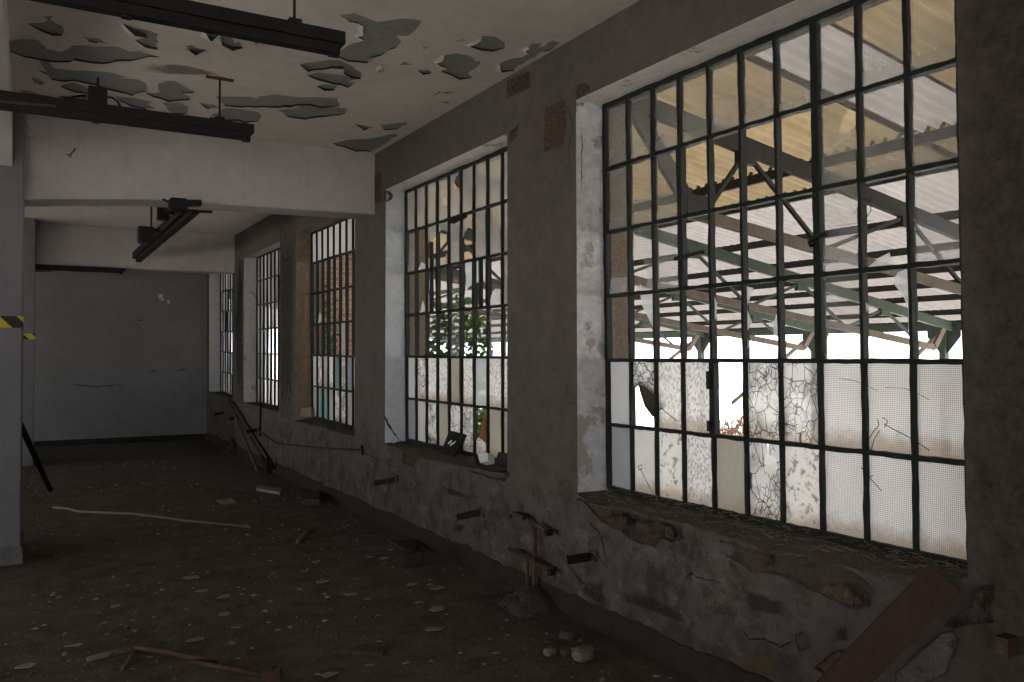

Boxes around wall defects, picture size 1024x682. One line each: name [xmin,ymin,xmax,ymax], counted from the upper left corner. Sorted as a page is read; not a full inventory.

peeling [9,13,421,123]
peeling [332,122,408,152]